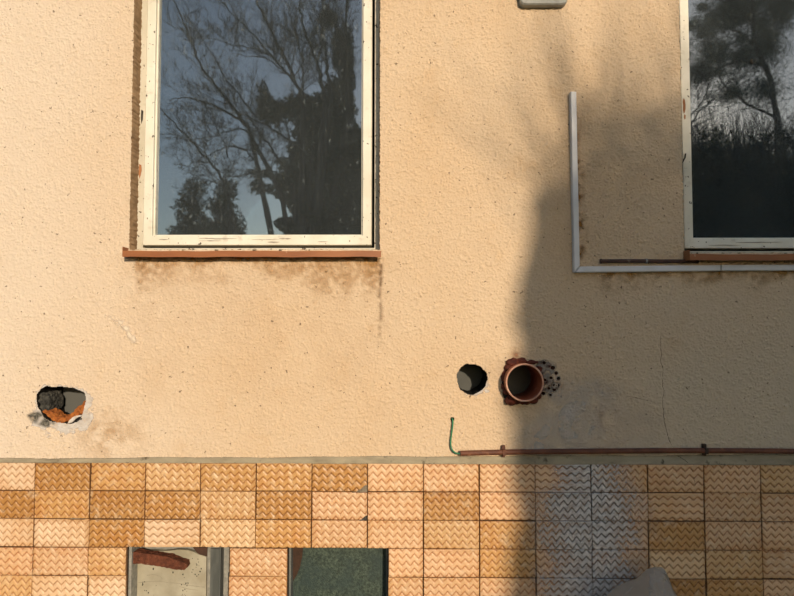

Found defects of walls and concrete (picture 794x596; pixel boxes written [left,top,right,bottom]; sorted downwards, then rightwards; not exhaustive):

spalling [28,385,93,434]
damp [542,464,635,596]